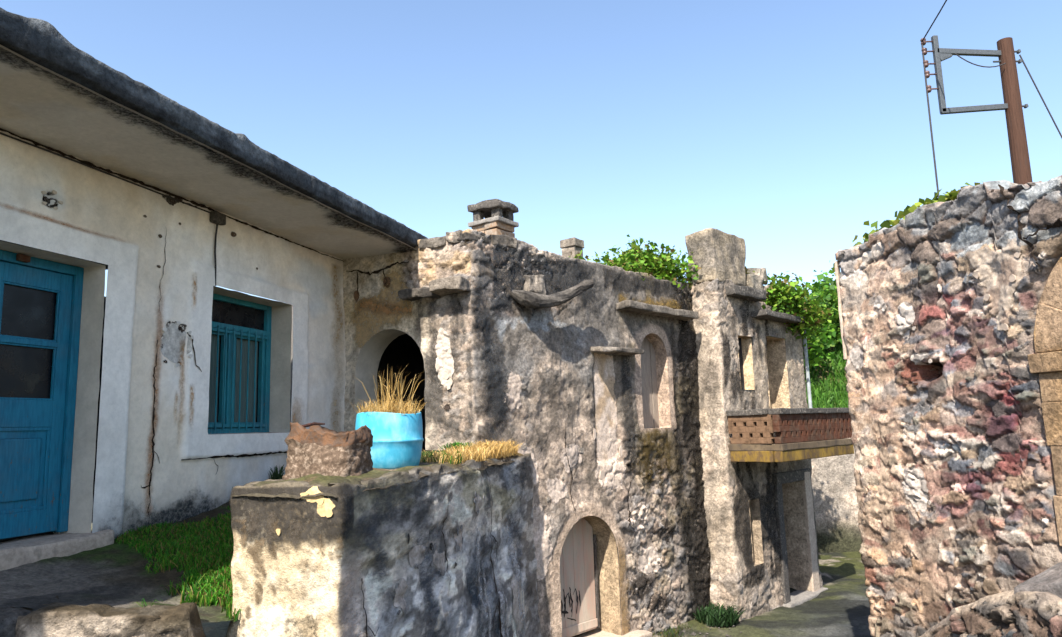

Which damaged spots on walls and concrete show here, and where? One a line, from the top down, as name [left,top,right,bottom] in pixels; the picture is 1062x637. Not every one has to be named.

crack [0,128,409,295]
peeling [161,321,194,368]
crack [141,229,287,518]
peeling [300,486,335,518]